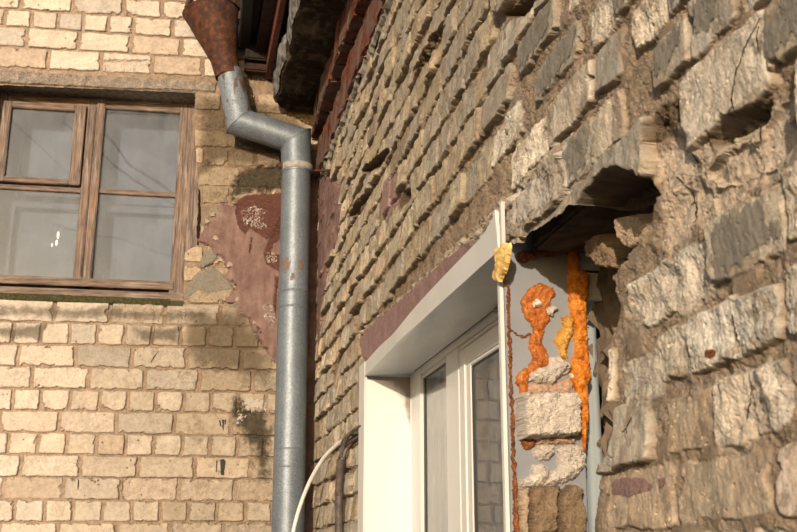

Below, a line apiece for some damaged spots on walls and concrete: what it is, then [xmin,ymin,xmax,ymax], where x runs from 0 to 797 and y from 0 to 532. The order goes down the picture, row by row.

damp [235,193,281,324]
damp [234,394,268,430]
flaking render [198,166,342,532]